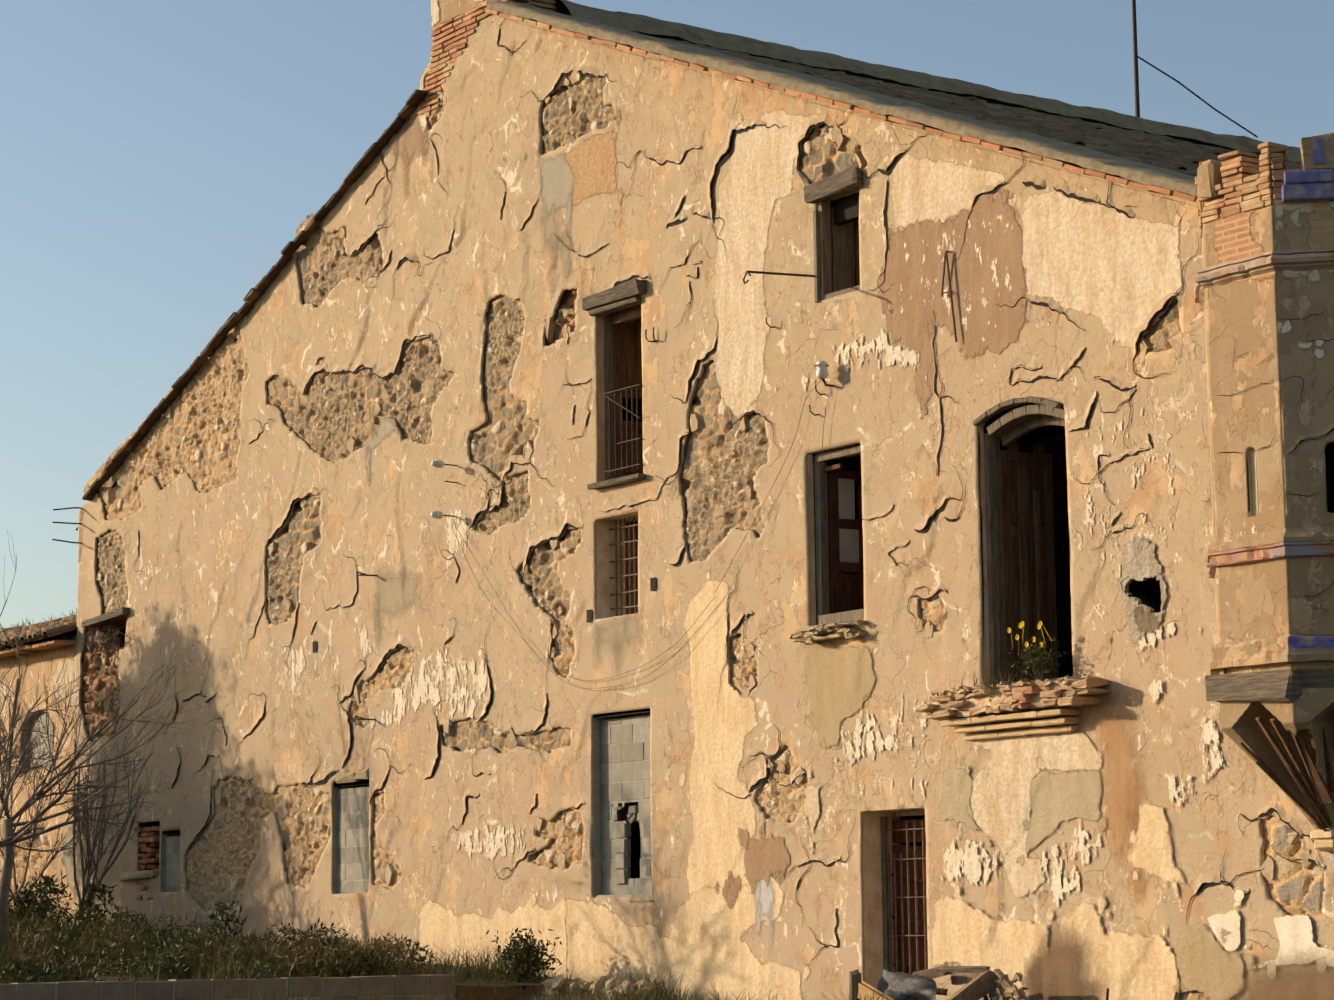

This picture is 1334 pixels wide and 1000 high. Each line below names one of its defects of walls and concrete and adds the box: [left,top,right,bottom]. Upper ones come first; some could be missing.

spalling [295,213,383,307]
spalling [267,337,455,462]
crack [302,133,458,395]
crack [497,111,853,579]
crack [845,133,929,295]
crack [955,157,1137,260]
crack [997,234,1199,550]
spalling [45,326,249,740]
spalling [145,495,571,753]
crack [292,606,553,833]
flaking render [418,109,1225,1000]
spalling [1207,815,1334,975]